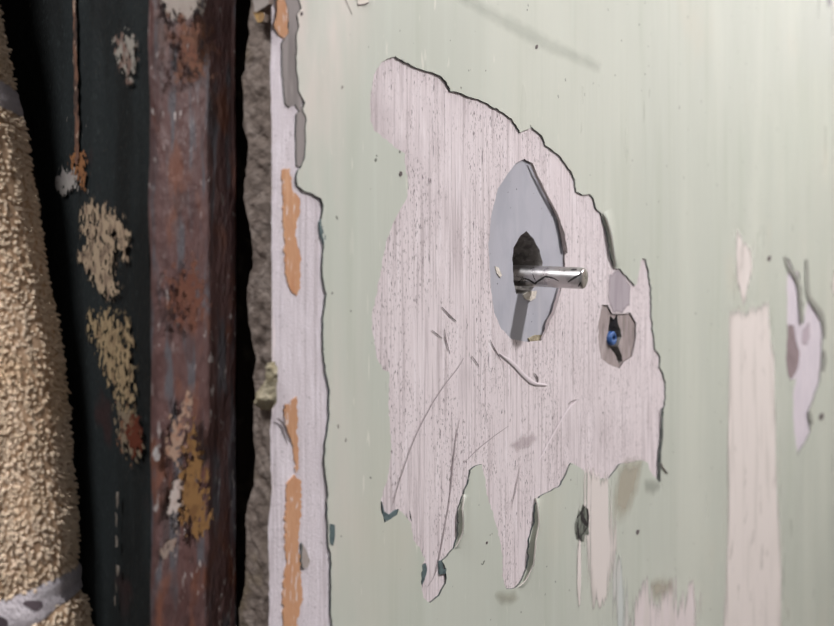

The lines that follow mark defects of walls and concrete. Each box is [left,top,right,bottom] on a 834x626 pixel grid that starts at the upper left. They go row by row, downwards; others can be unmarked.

rust [166,13,216,84]
peeling [55,167,81,196]
peeling [77,198,193,467]
rust [163,252,209,330]
flaking render [239,0,331,626]
peeling [370,57,665,602]
peeling [784,256,826,454]
peeling [160,527,181,559]
peeling [167,479,183,515]
rust [173,415,213,542]